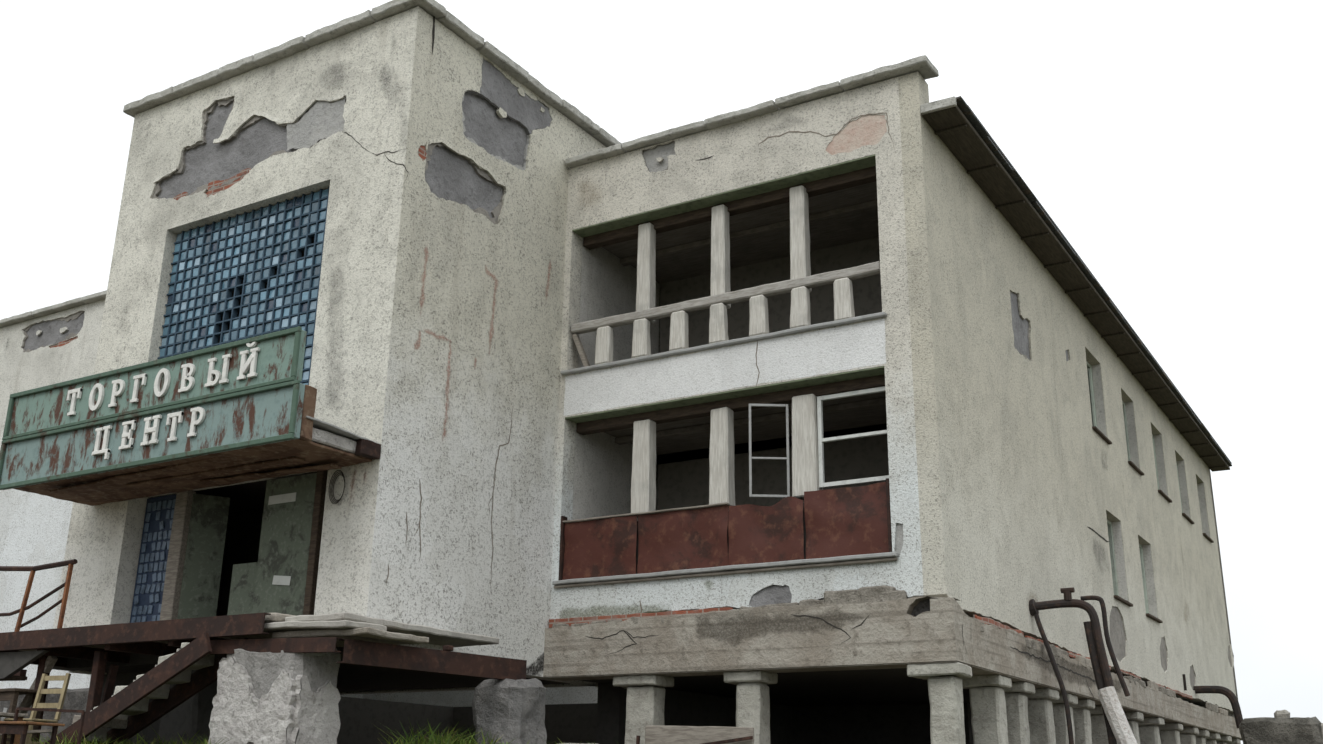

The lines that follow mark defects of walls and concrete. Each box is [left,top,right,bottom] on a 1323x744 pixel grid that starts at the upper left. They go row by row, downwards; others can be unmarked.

spalling [152,93,346,200]
crack [345,132,408,185]
spalling [418,59,552,225]
crack [759,113,894,145]
flaking render [826,115,887,155]
spalling [22,311,85,352]
spalling [1010,291,1031,360]
crack [488,409,513,599]
crack [586,601,658,656]
spalling [549,580,932,628]
crack [791,614,867,643]